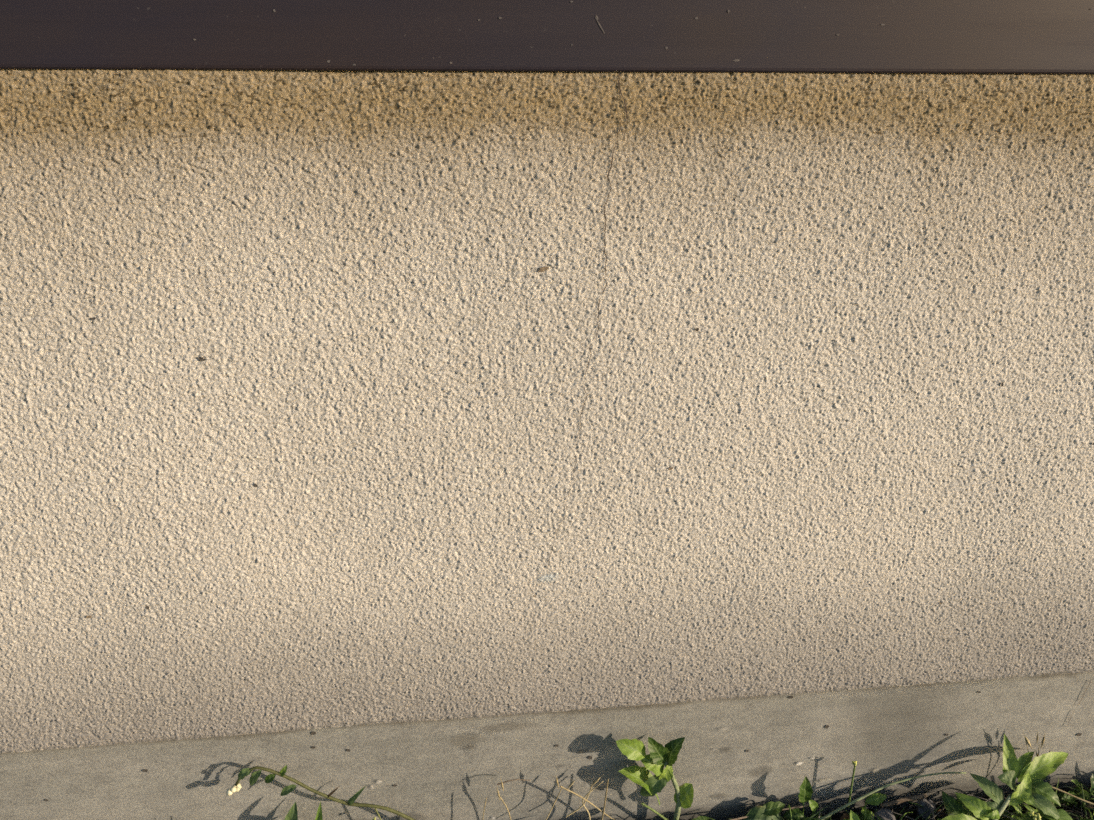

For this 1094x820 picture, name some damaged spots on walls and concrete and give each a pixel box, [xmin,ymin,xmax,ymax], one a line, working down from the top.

water stain [0,69,1094,161]
crack [548,72,628,566]